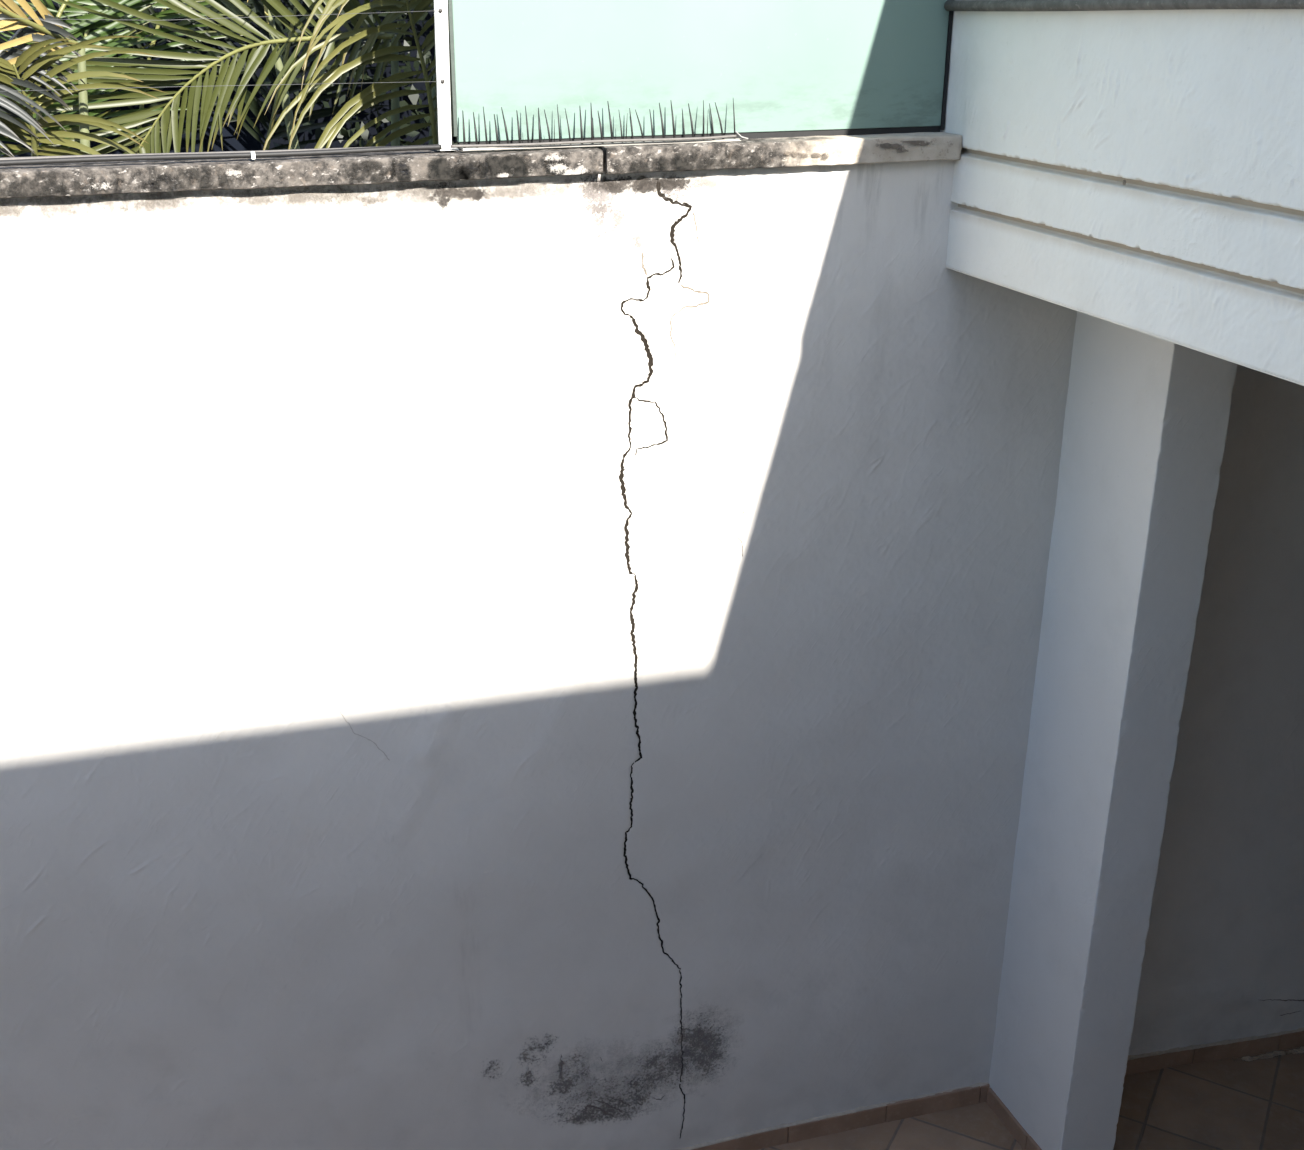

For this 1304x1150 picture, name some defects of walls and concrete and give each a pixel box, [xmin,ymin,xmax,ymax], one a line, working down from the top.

leakage [520,1015,727,1124]
crack [606,182,710,1138]